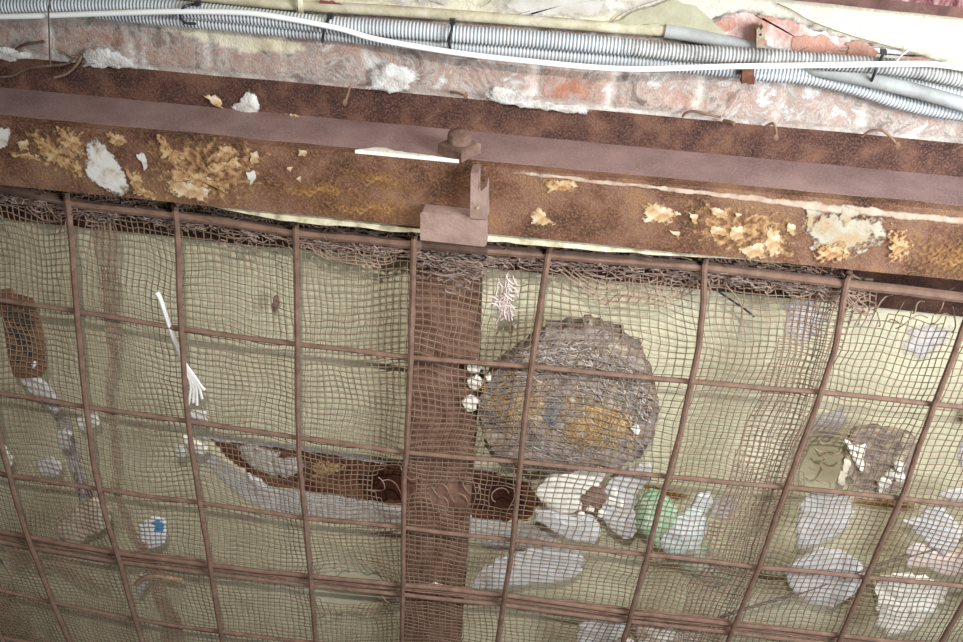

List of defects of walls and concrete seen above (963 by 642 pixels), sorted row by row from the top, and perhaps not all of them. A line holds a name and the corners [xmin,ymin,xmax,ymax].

flaking render [496,0,933,61]
peeling [0,126,274,210]
corrosion [265,167,418,223]
peeling [523,172,963,265]
corrosion [902,236,963,279]
flaking render [195,434,402,525]
flaking render [469,470,558,550]